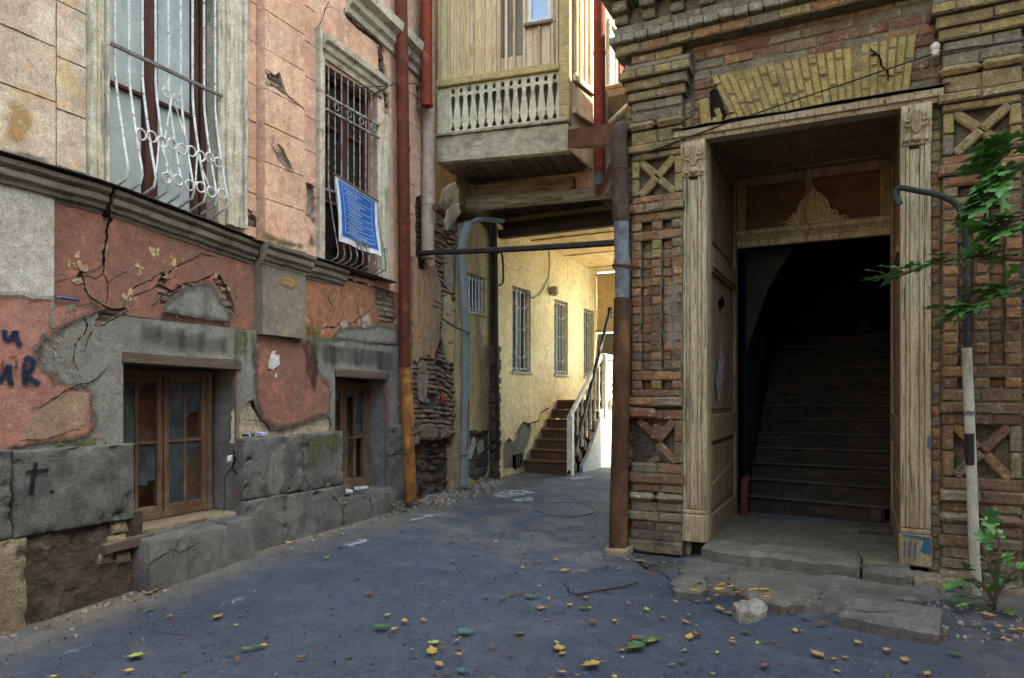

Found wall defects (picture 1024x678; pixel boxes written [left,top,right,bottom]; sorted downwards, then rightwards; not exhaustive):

spalling [264,68,284,94]
water stain [11,105,30,139]
spalling [273,145,293,173]
crack [32,193,238,409]
spalling [148,246,181,305]
spalling [211,272,233,316]
crack [321,286,376,330]
peeling [0,263,144,450]
peeling [229,328,334,443]
spalling [468,345,532,481]
crack [144,450,237,574]